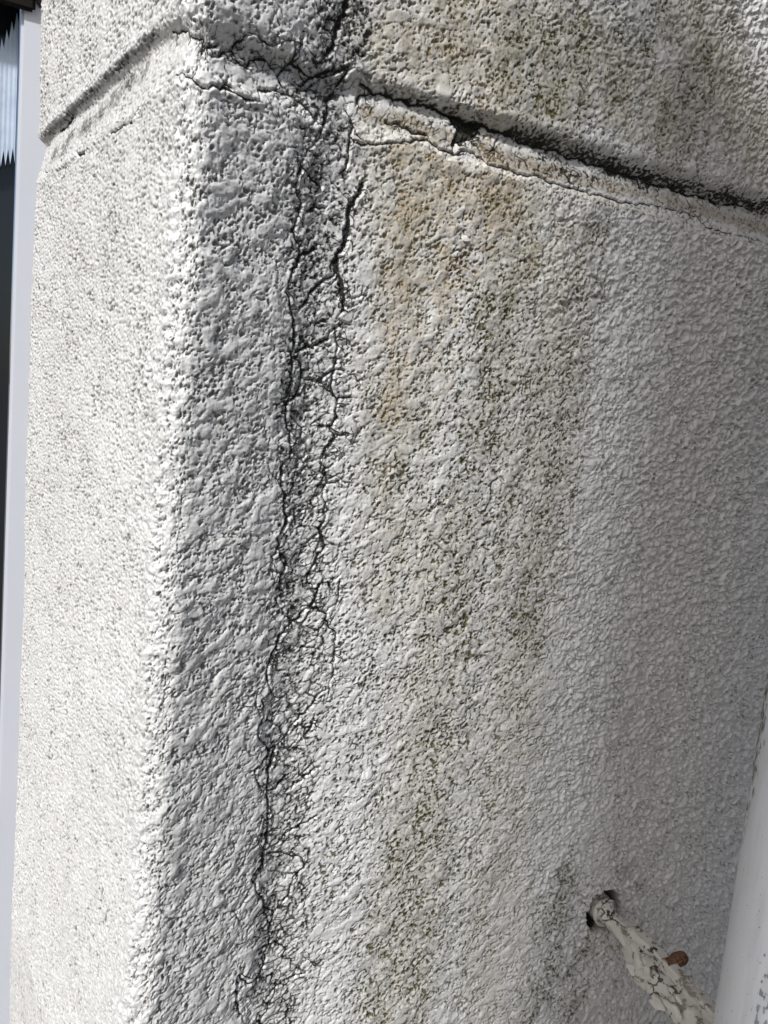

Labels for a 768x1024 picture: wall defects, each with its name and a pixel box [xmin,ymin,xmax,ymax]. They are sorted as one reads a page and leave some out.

crack [169,0,766,1024]